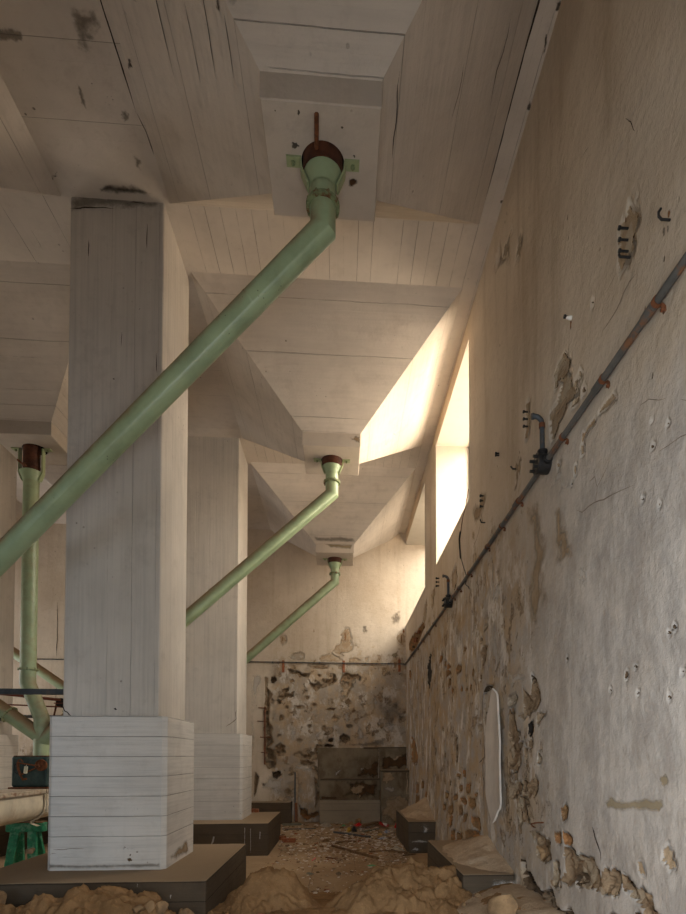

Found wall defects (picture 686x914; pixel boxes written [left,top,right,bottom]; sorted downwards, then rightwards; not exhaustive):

crack [486,0,540,196]
peeling [549,352,586,439]
spalling [409,622,425,651]
peeling [254,641,368,808]
flaking render [434,625,658,914]